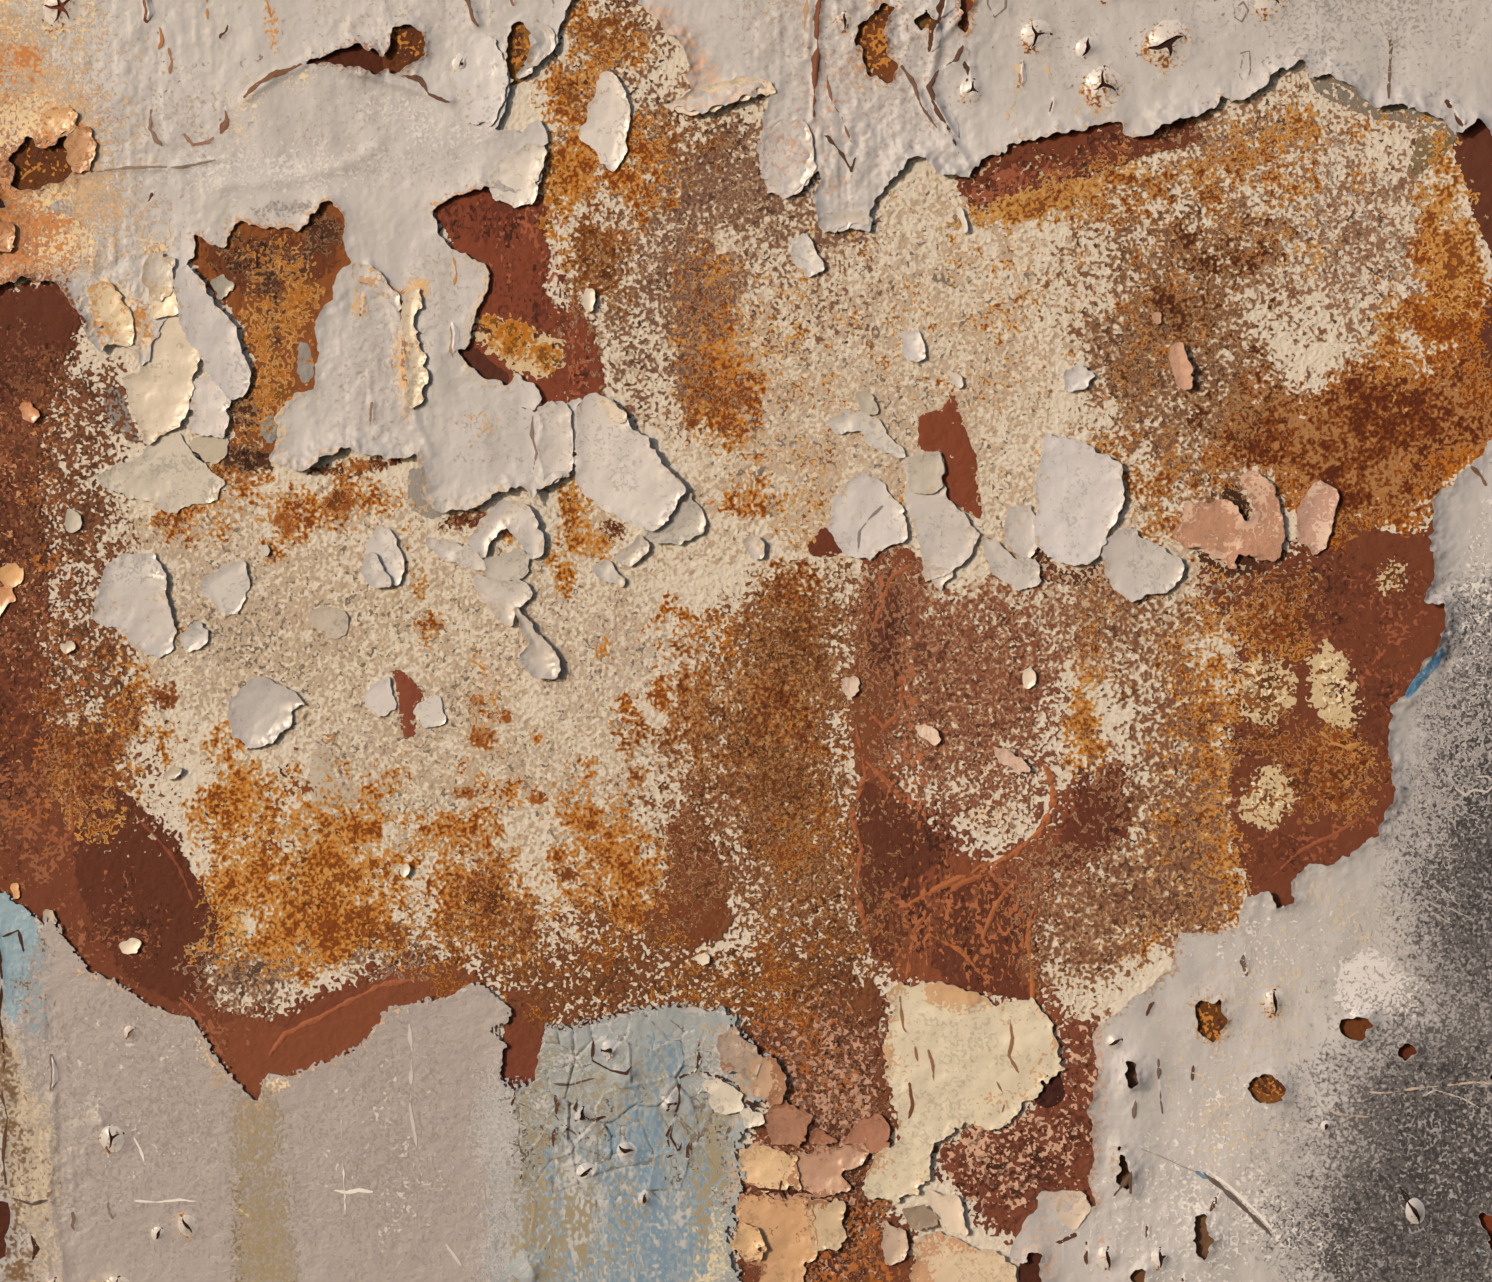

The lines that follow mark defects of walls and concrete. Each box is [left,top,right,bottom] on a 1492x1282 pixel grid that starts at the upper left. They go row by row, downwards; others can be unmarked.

peeling [40,106,97,173]
rust [304,23,435,81]
crack [802,0,856,172]
rust [949,0,978,51]
peeling [351,263,429,408]
rust [483,528,527,560]
peeling [1354,453,1492,733]
peeling [119,938,142,954]
rust [1181,977,1243,1048]
peeling [0,994,100,1282]
crack [508,1014,772,1221]
rust [723,1149,918,1282]